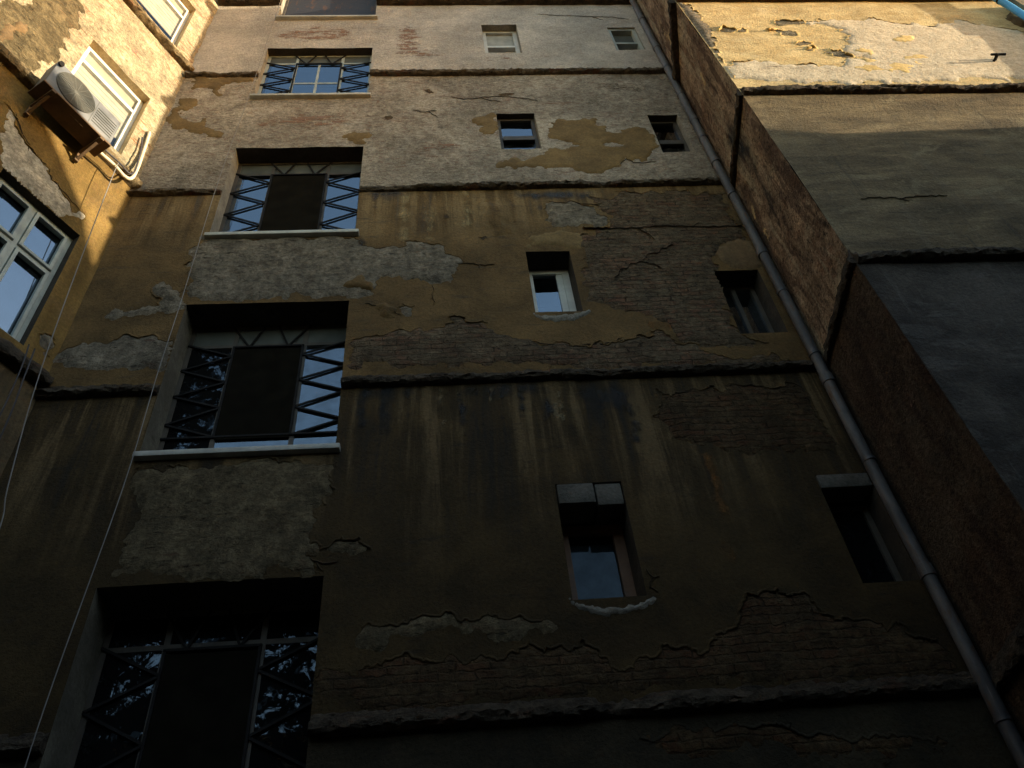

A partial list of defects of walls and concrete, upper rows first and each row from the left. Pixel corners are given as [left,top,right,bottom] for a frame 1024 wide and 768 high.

flaking render [0,0,87,74]
flaking render [678,2,1024,85]
flaking render [0,100,87,222]
crack [861,194,947,202]
flaking render [37,235,466,374]
flaking render [543,189,768,350]
flaking render [106,456,338,583]